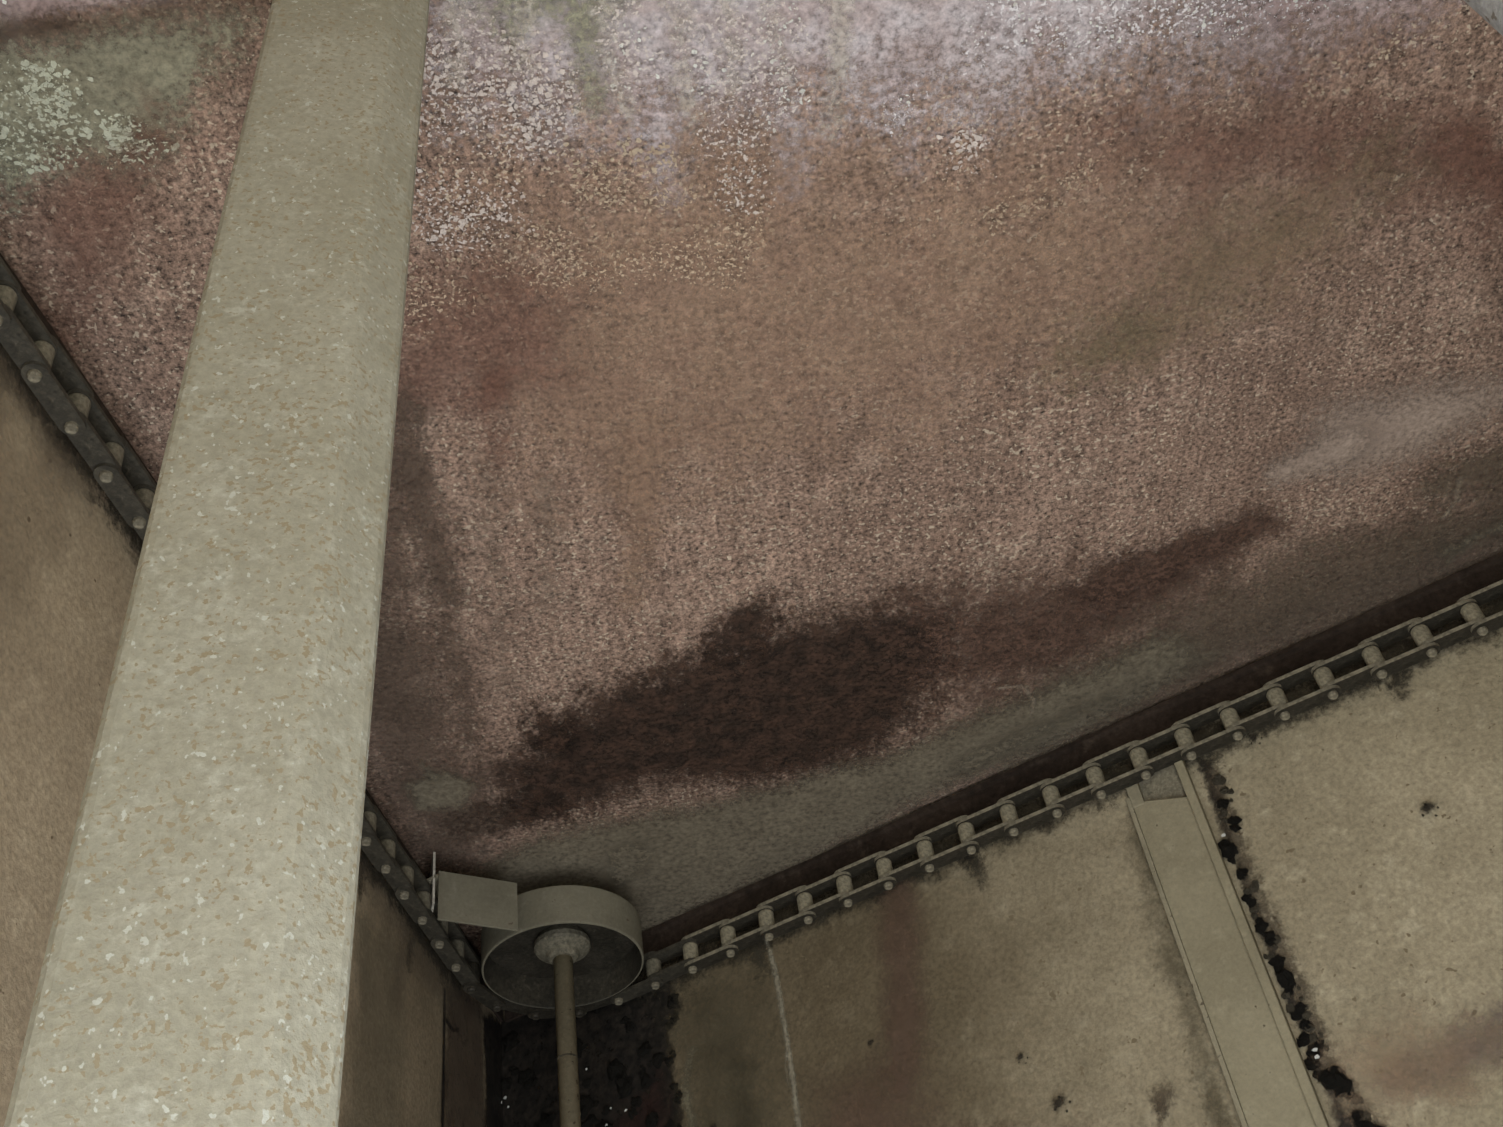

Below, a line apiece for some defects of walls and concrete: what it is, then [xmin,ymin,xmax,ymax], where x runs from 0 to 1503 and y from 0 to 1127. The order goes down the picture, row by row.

leakage [1266,377,1503,484]
leakage [368,395,1503,932]
leakage [359,850,369,902]